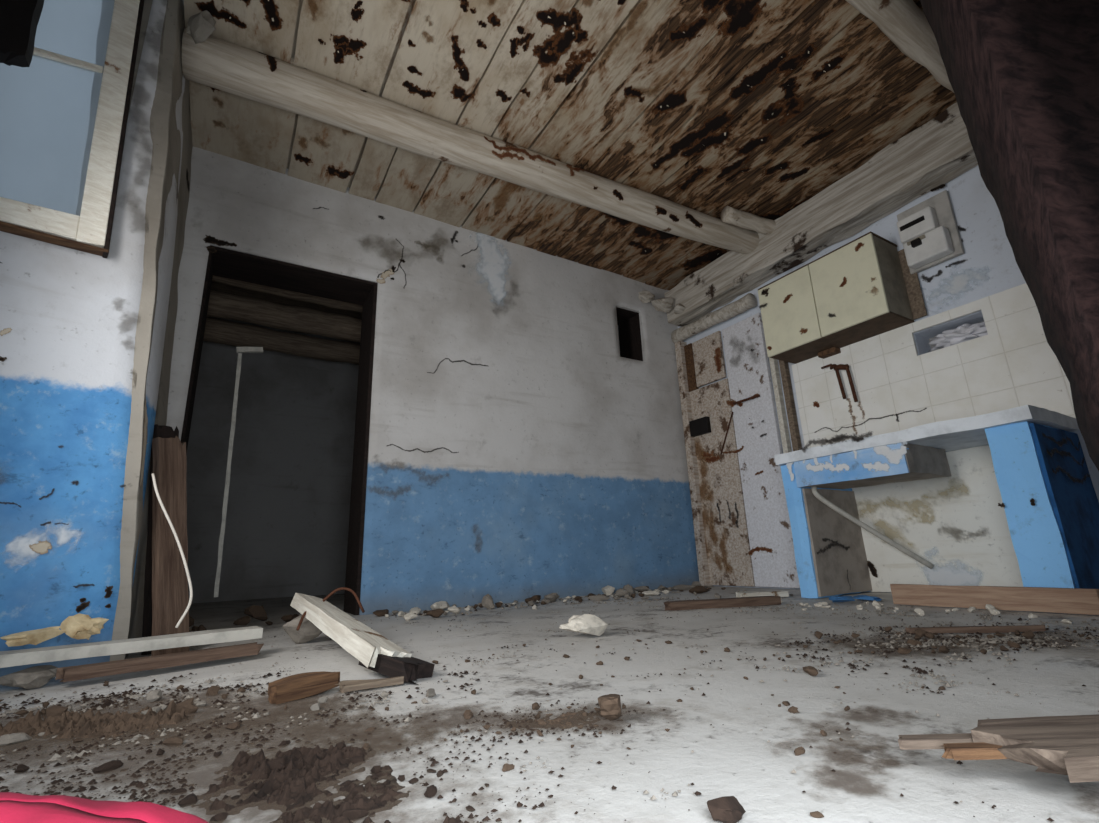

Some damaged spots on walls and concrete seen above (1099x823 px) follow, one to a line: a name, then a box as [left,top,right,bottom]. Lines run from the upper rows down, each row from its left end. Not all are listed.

water stain [308,0,318,20]
water stain [601,1,647,59]
corrosion [484,136,592,176]
water stain [487,182,521,221]
water stain [417,231,458,261]
crack [427,358,488,374]
corrosion [714,347,722,373]
crack [387,444,459,453]
corrosion [703,446,744,463]
peeling [803,442,909,473]
spalling [29,540,52,554]
spalling [76,598,90,613]